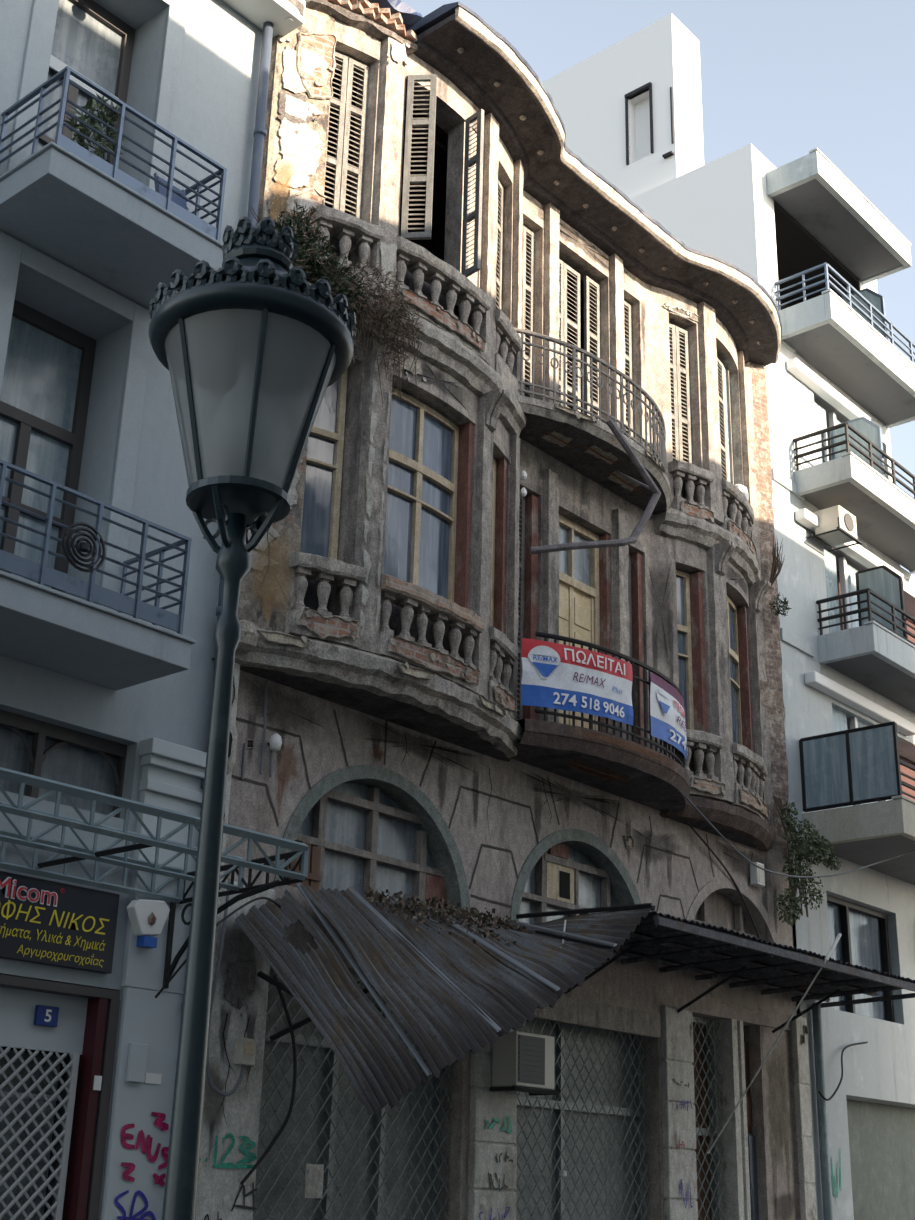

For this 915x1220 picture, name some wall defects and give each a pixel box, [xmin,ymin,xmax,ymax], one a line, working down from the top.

peeling [288,0,304,16]
peeling [273,31,337,236]
flaking render [380,241,487,352]
peeling [247,526,281,571]
flaking render [257,348,427,651]
flaking render [388,635,517,717]